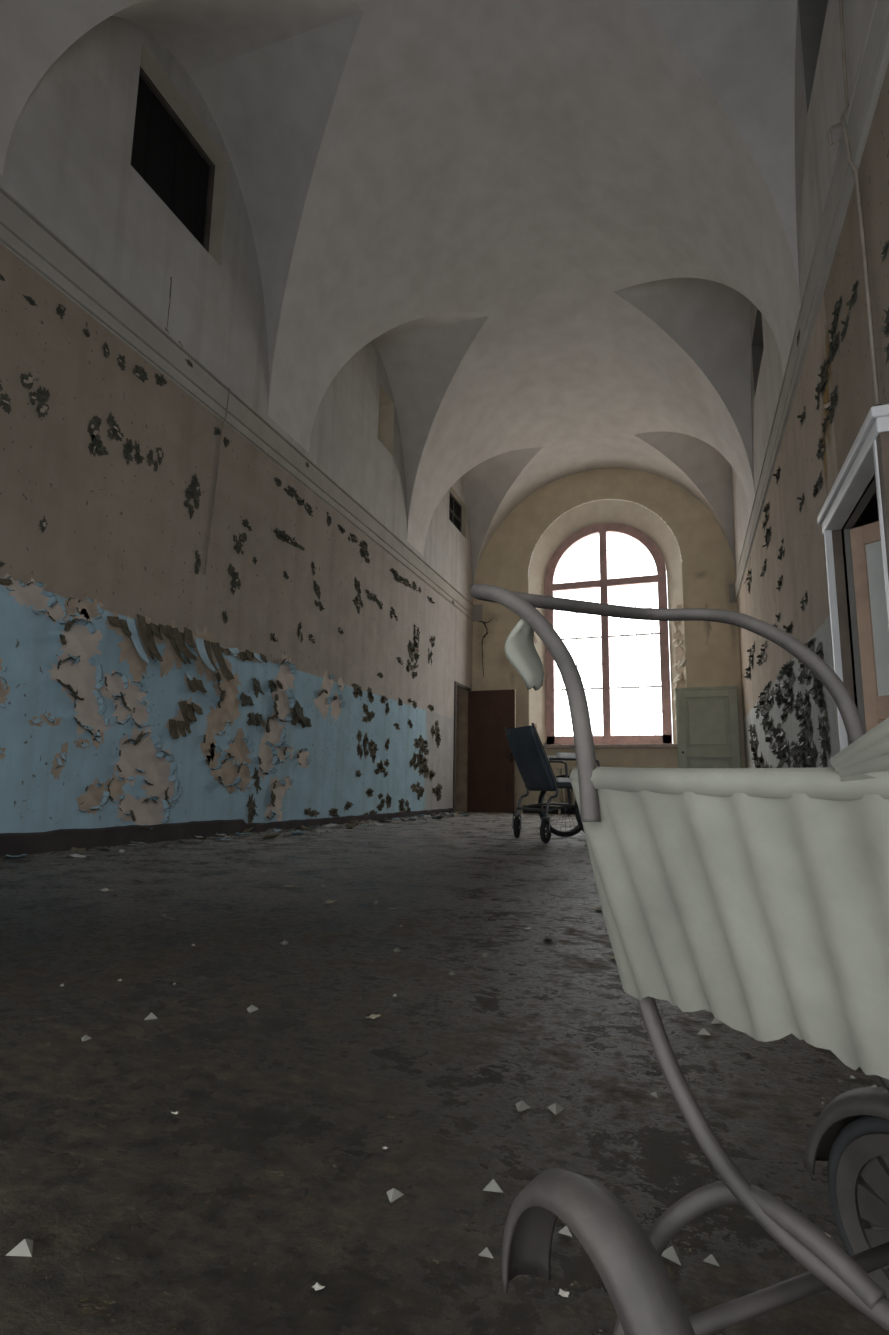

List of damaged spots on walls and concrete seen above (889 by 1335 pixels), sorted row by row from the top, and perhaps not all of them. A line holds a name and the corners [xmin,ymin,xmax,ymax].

peeling [0,380,11,415]
peeling [20,372,50,418]
peeling [83,328,167,386]
peeling [797,281,858,513]
peeling [87,412,164,472]
peeling [183,474,201,520]
peeling [228,519,257,595]
peeling [274,527,325,611]
peeling [274,477,370,564]
peeling [746,502,785,593]
peeling [0,561,443,829]
peeling [745,593,831,768]